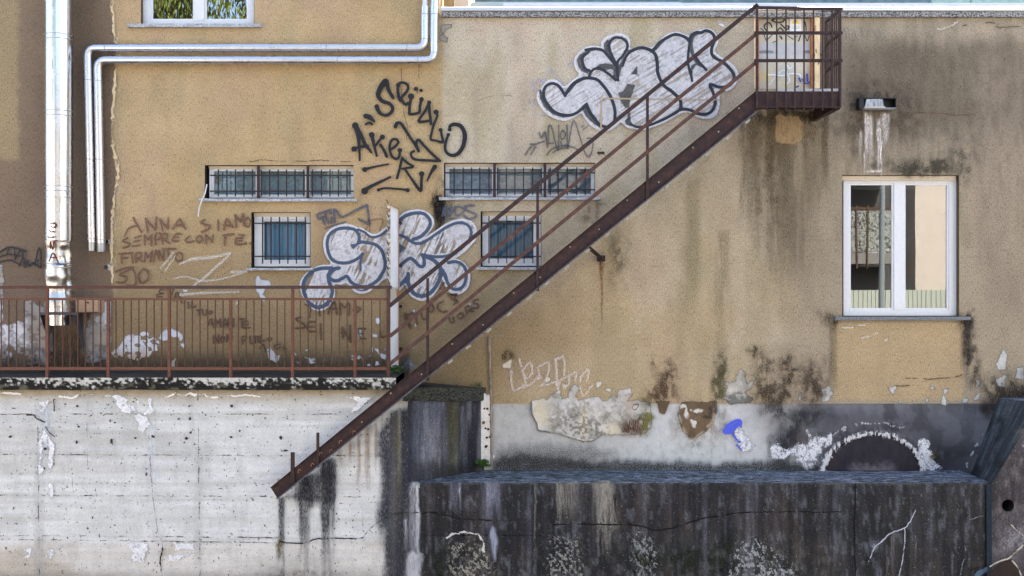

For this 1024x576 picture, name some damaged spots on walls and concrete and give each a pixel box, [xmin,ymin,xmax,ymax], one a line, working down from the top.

damp [864,113,948,178]
flaking render [531,376,652,442]
damp [648,362,675,408]
damp [712,355,727,404]
peeling [723,369,755,405]
damp [749,346,941,471]
peeling [925,385,948,406]
peeling [962,348,1024,403]
damp [278,459,336,557]
damp [378,402,422,576]
crack [552,511,841,531]
crack [868,510,916,576]